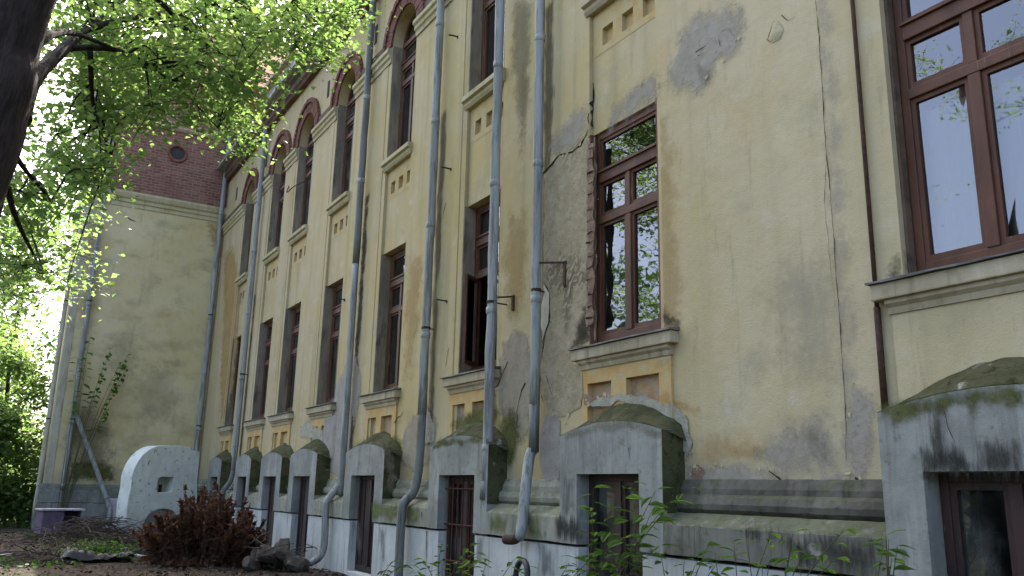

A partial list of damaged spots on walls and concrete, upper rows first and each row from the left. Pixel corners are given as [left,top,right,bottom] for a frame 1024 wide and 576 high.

peeling [668,2,746,94]
crack [494,87,594,413]
spalling [494,135,782,480]
crack [815,0,846,449]
water stain [921,407,1019,476]